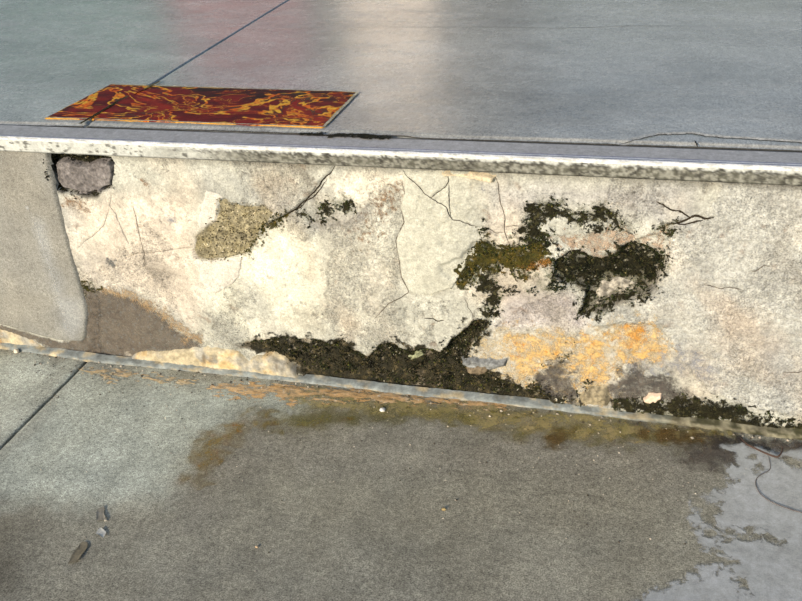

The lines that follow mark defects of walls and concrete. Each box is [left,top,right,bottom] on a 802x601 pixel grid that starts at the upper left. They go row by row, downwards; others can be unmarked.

crack [619,133,801,147]
spalling [43,153,115,199]
crack [272,166,335,223]
crack [404,172,516,240]
crack [657,202,714,230]
spalling [526,224,673,325]
water stain [0,286,202,356]
spalling [241,311,559,403]
water stain [207,381,802,472]
rust [480,322,677,405]
spalling [643,392,662,404]
water stain [609,345,712,408]